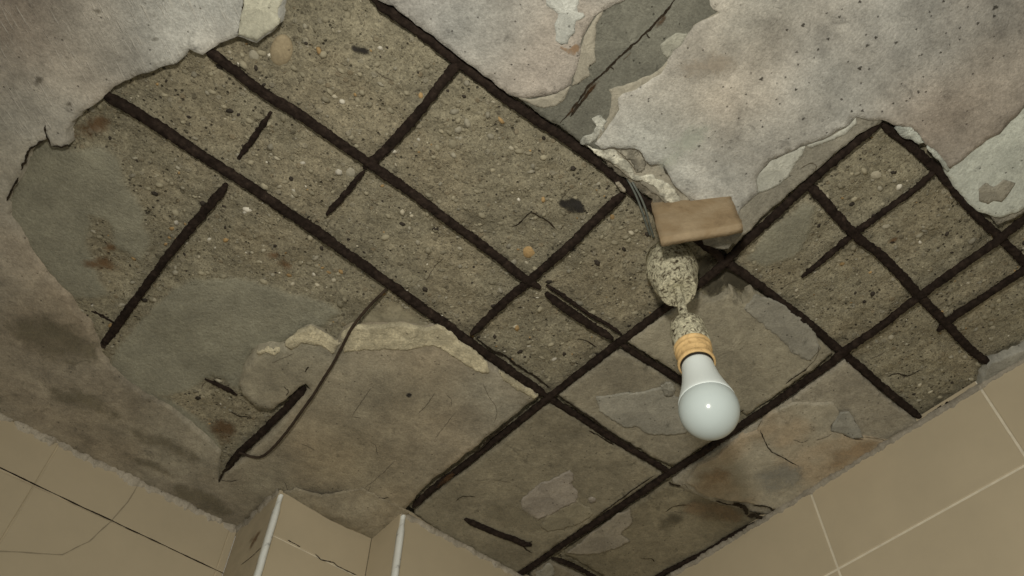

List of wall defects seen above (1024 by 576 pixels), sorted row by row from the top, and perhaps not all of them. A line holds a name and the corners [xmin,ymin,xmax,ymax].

crack [560,0,675,123]
spalling [717,108,1024,290]
spalling [11,99,489,477]
spalling [110,0,917,576]
spalling [850,276,1024,415]
spalling [927,245,1021,317]
crack [0,467,253,573]
crack [218,455,236,483]